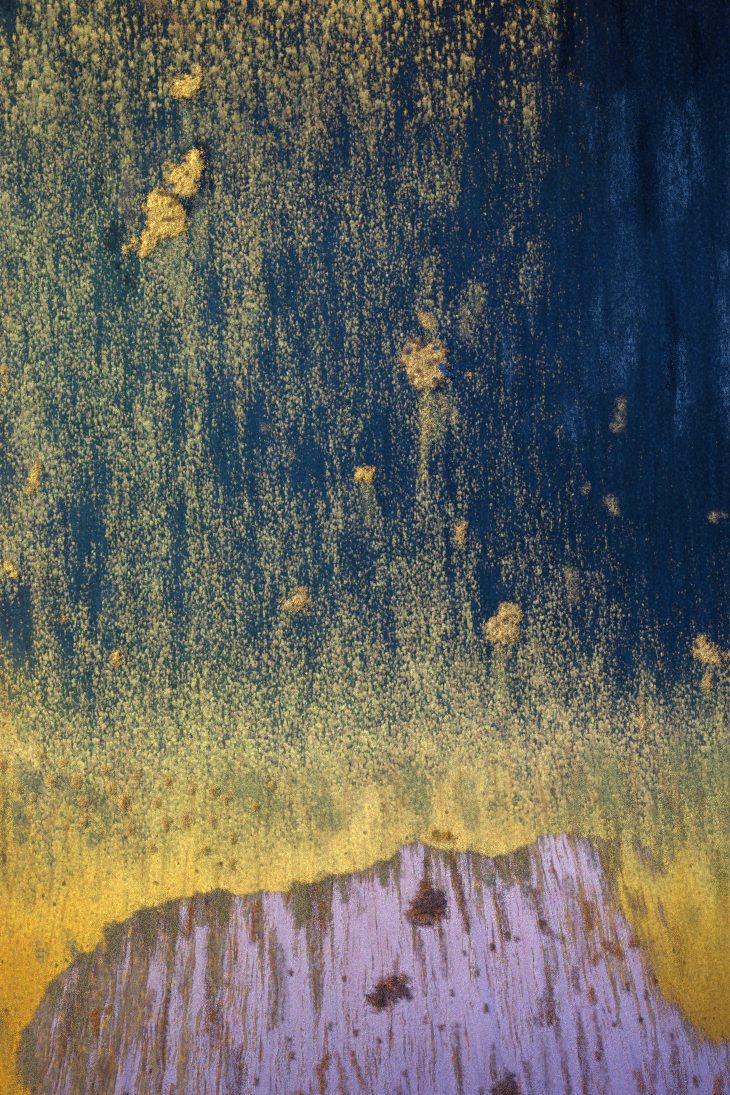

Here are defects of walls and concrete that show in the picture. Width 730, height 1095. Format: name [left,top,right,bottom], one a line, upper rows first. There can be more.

peeling [15,832,730,1095]
rust [364,963,413,1012]
rust [405,857,469,970]
rust [478,1046,528,1095]